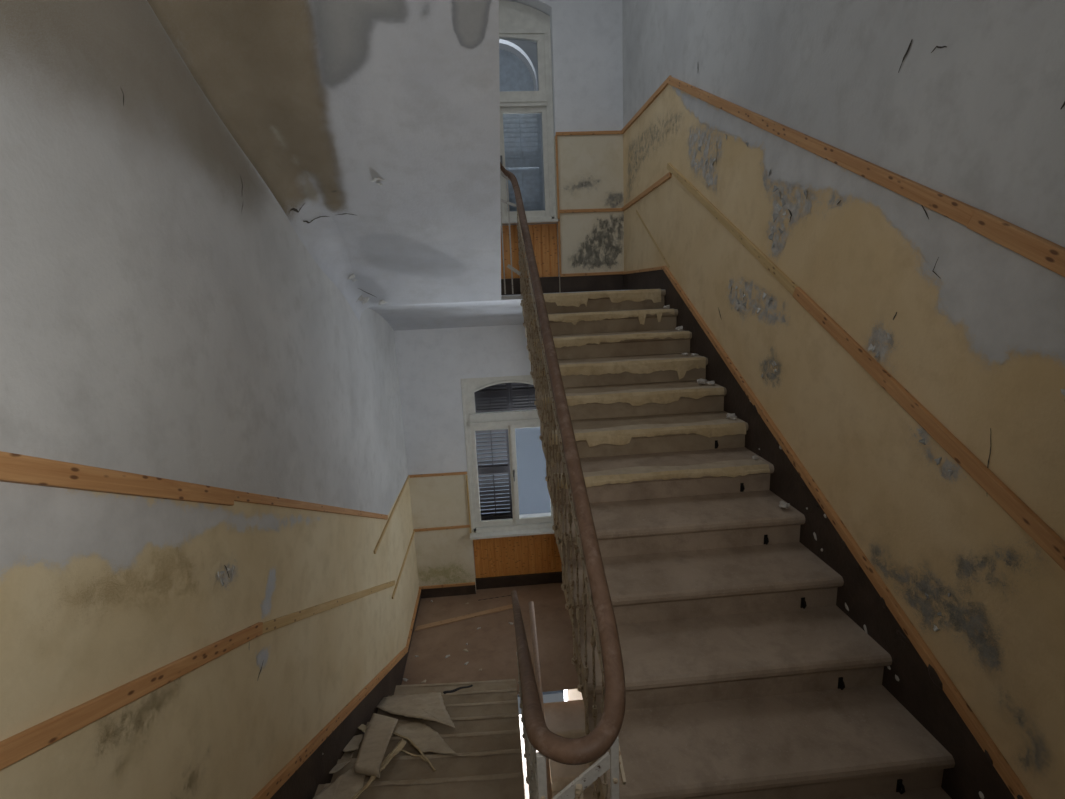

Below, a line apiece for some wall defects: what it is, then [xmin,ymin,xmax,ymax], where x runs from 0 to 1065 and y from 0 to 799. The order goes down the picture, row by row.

water stain [147,0,493,225]
water stain [563,104,685,271]
water stain [862,528,1062,796]